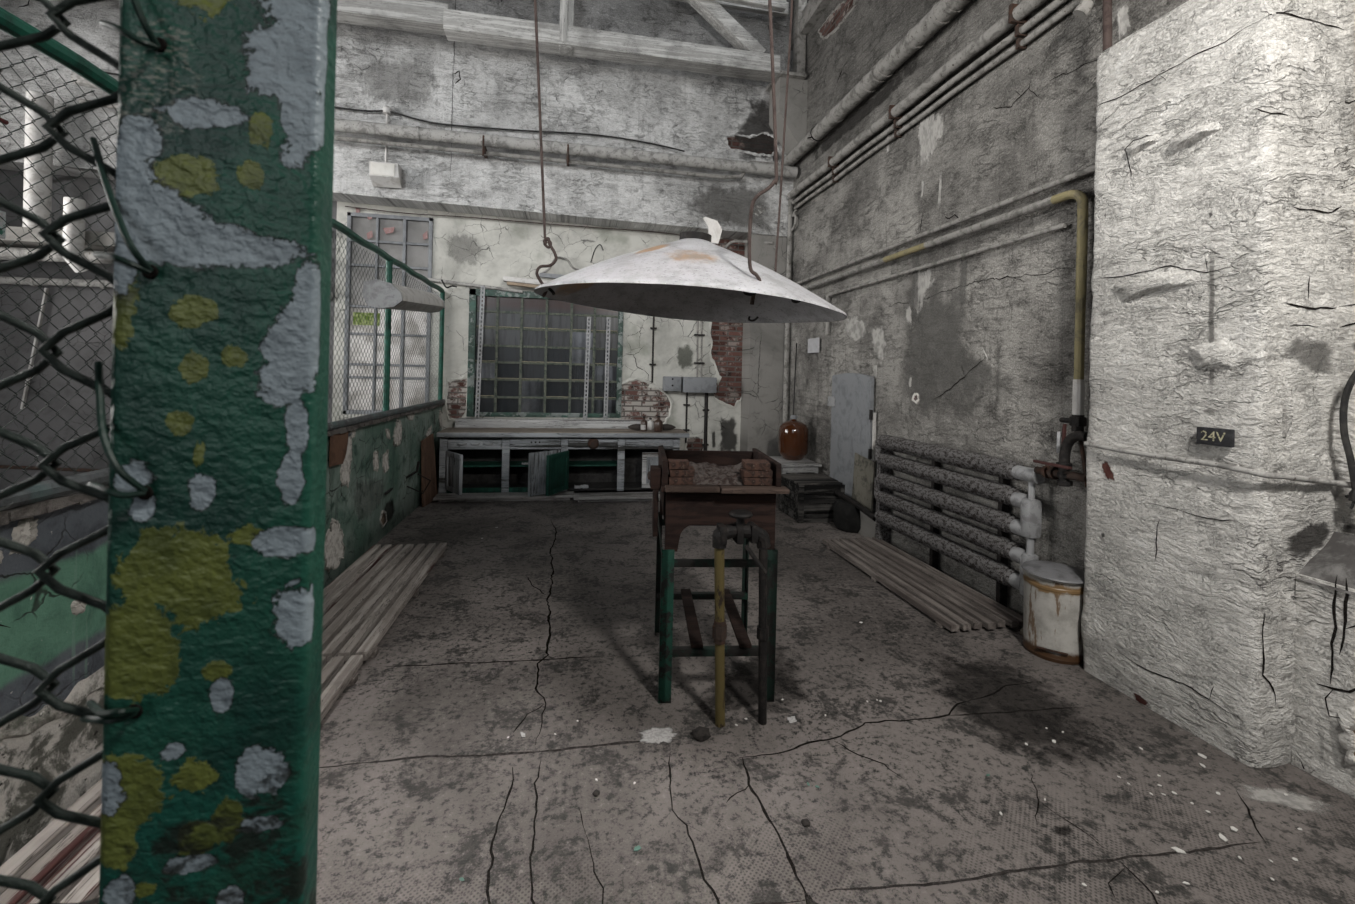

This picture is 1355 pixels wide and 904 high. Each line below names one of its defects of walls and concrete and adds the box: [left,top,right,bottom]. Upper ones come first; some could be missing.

flaking render [721,132,781,157]
flaking render [715,237,745,257]
flaking render [618,377,674,424]
flaking render [707,322,743,409]
peeling [324,518,345,572]
crack [483,522,557,904]
crack [1114,649,1239,719]
crack [1262,612,1276,703]
crack [1317,576,1355,718]
flaking render [1336,706,1355,767]
crack [668,752,720,904]
crack [726,701,966,904]